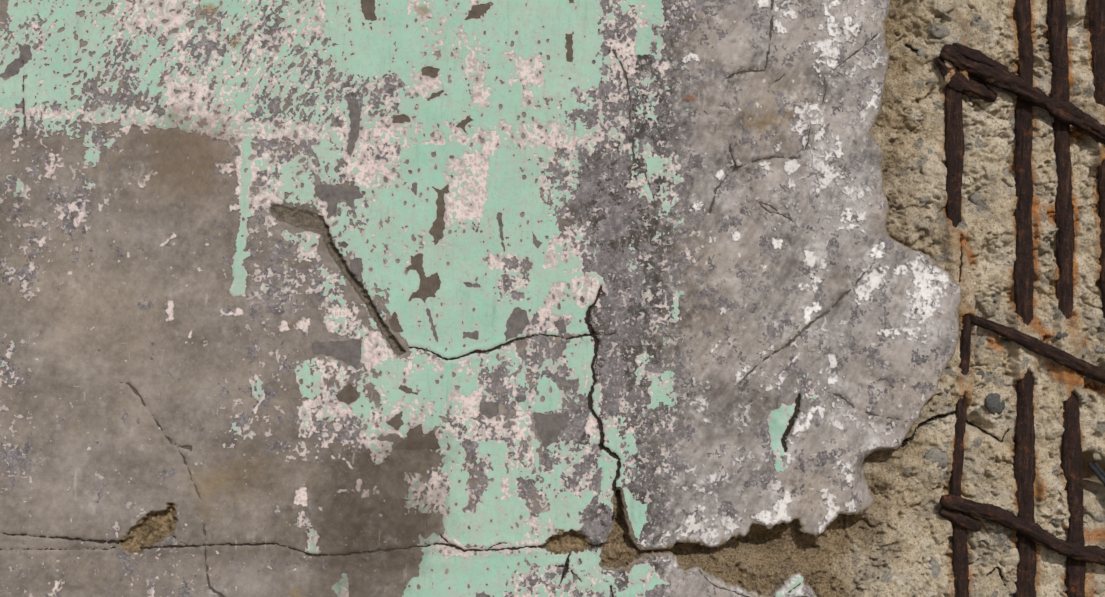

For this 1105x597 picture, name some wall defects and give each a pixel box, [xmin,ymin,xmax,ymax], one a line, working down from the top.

crack [709,32,880,213]
peeling [743,0,889,149]
spalling [934,0,1105,326]
rust [1032,198,1055,277]
crack [0,285,621,597]
peeling [255,477,386,597]
crack [781,393,801,452]
crack [739,265,872,383]
crack [828,392,1009,447]
spalling [938,369,1105,597]
spalling [951,314,1105,384]
rust [1045,362,1105,394]